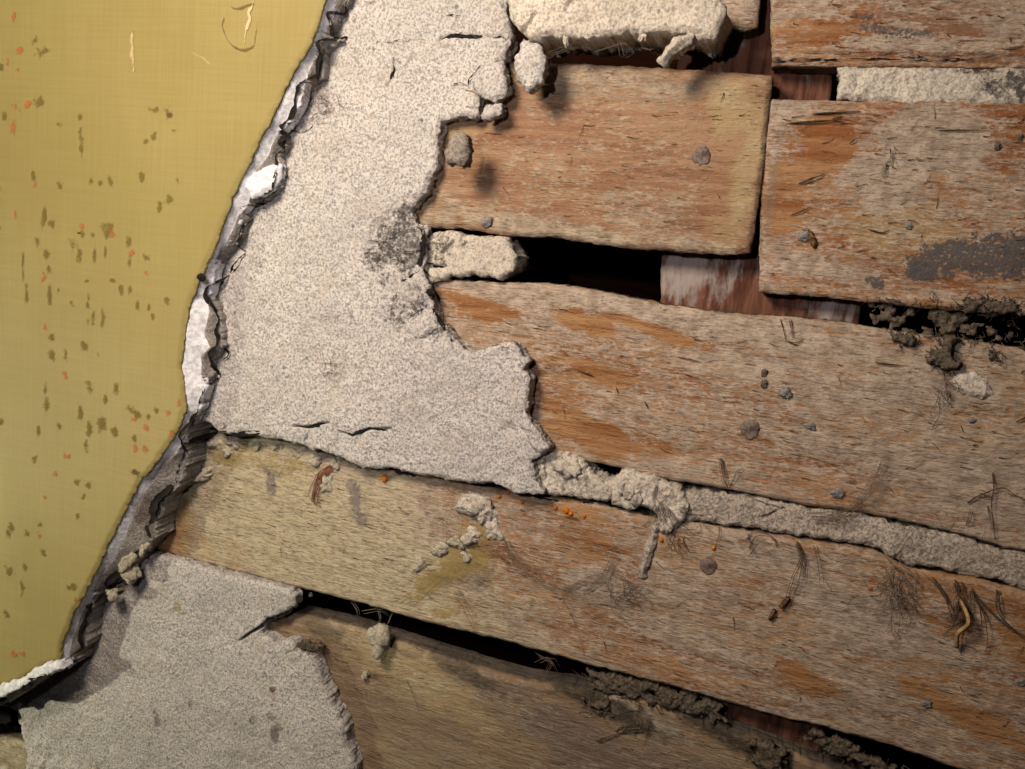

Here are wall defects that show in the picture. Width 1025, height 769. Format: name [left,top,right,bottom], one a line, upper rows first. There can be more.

crack [377,39,412,83]
peeling [472,39,551,123]
peeling [396,223,438,339]
crack [0,0,348,706]
spalling [0,0,354,698]
peeling [952,371,994,400]
crack [296,422,387,441]
peeling [520,409,553,455]
peeling [638,522,659,580]